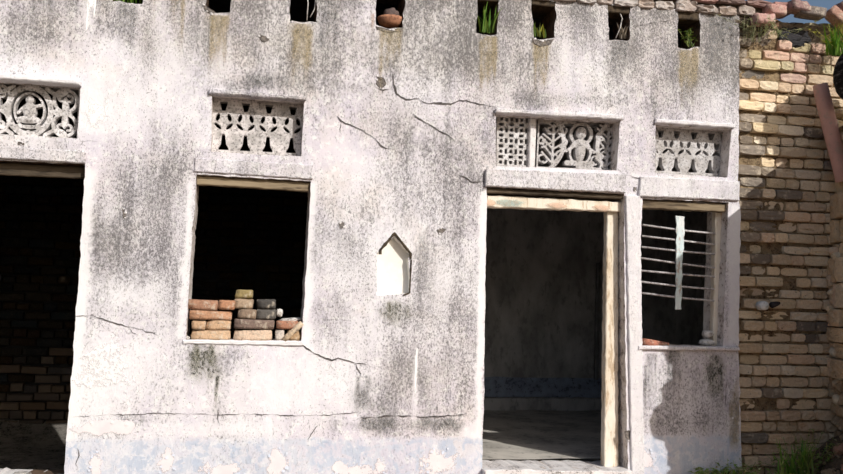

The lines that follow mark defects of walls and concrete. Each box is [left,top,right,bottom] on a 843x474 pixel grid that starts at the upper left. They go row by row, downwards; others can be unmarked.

water stain [293,0,337,58]
crack [379,77,495,140]
crack [337,116,396,150]
crack [75,312,158,336]
water stain [189,344,220,397]
crack [304,346,367,374]
peeling [332,458,387,474]
peeling [417,448,458,474]